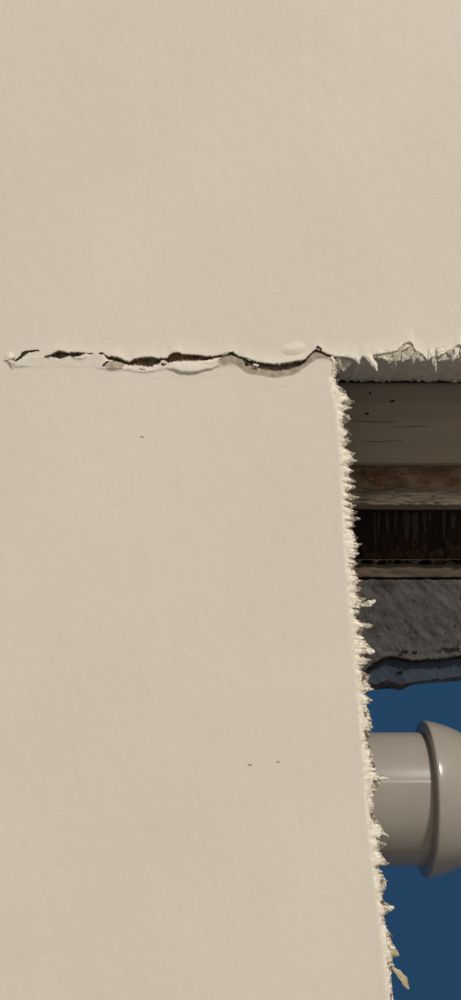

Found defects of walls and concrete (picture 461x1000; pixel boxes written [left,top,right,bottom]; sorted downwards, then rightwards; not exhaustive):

crack [3,332,342,387]
spalling [369,670,461,690]